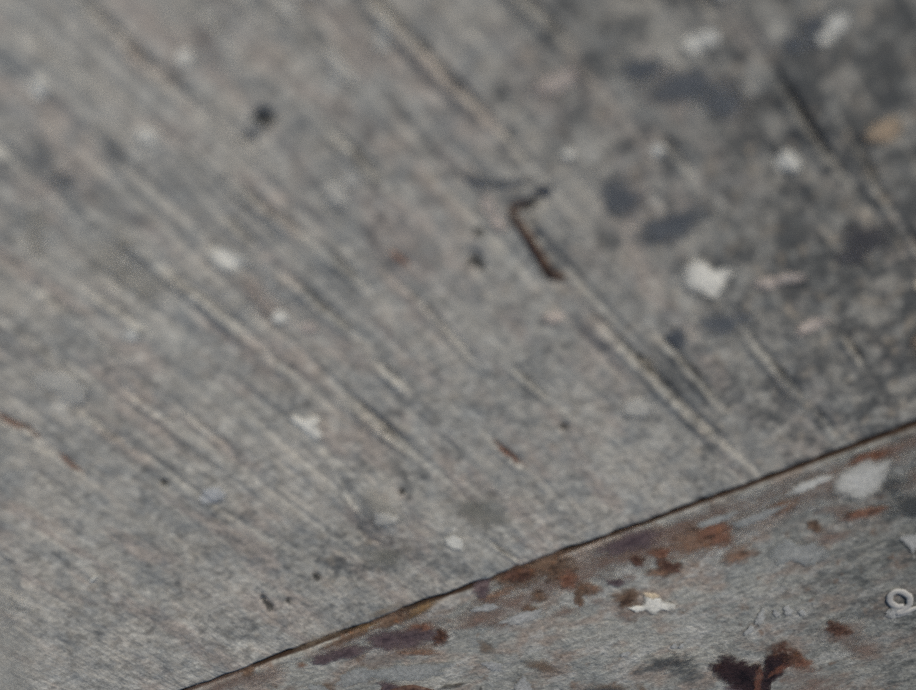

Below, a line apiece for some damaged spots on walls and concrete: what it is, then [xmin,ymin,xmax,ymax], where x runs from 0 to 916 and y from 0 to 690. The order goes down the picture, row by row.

rust [852,445,903,465]
rust [598,523,752,577]
rust [473,551,639,617]
rust [299,603,448,667]
rust [709,641,812,690]